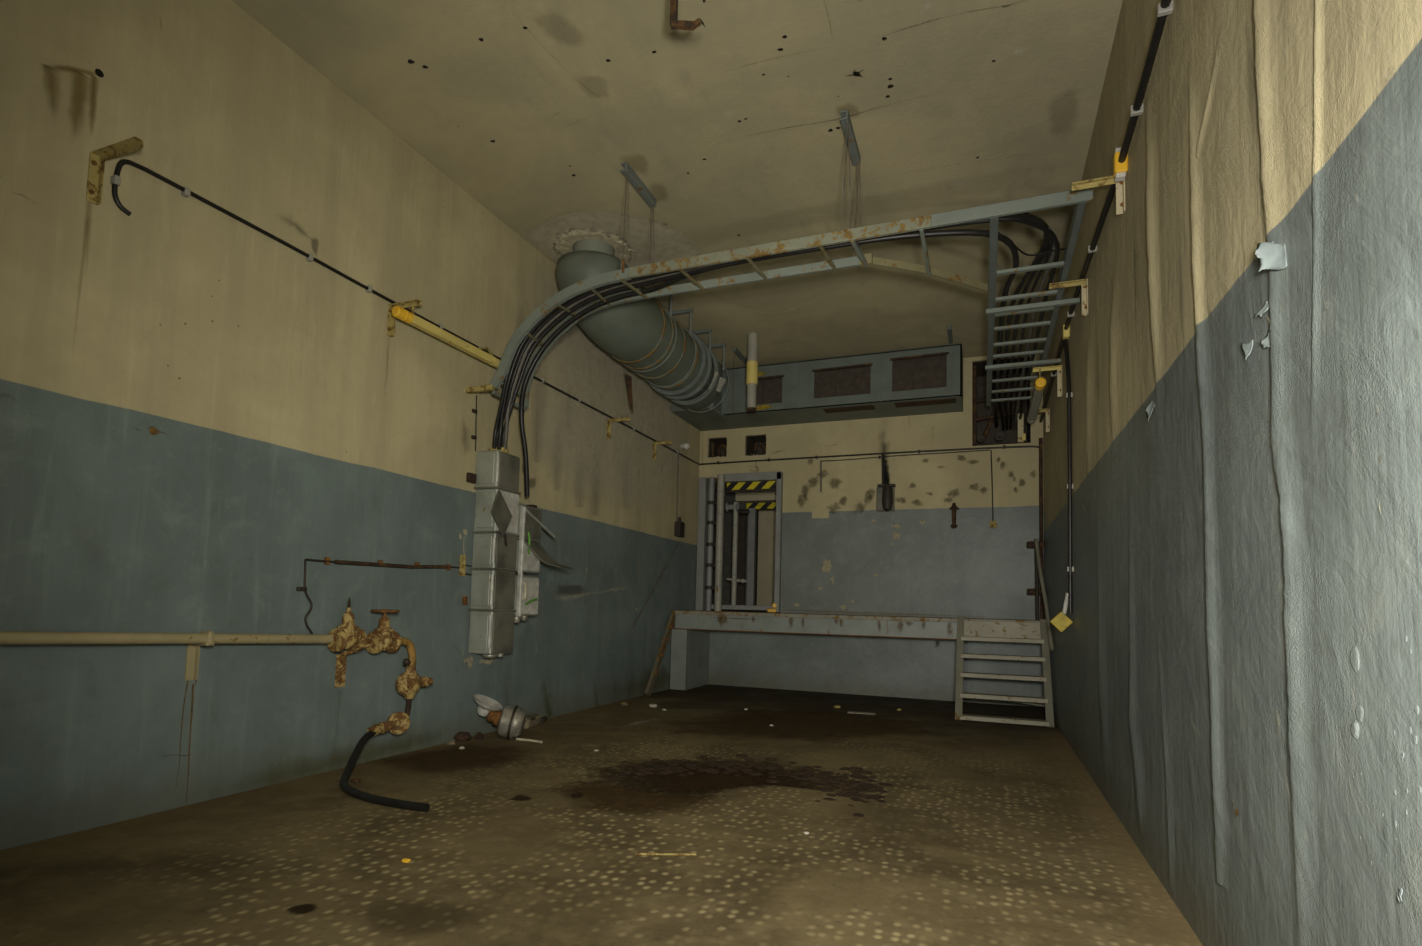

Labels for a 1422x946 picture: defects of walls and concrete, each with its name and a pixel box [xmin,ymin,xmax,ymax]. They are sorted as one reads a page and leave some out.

peeling [1255,241,1288,272]
peeling [1241,300,1284,360]
damp [564,758,828,812]